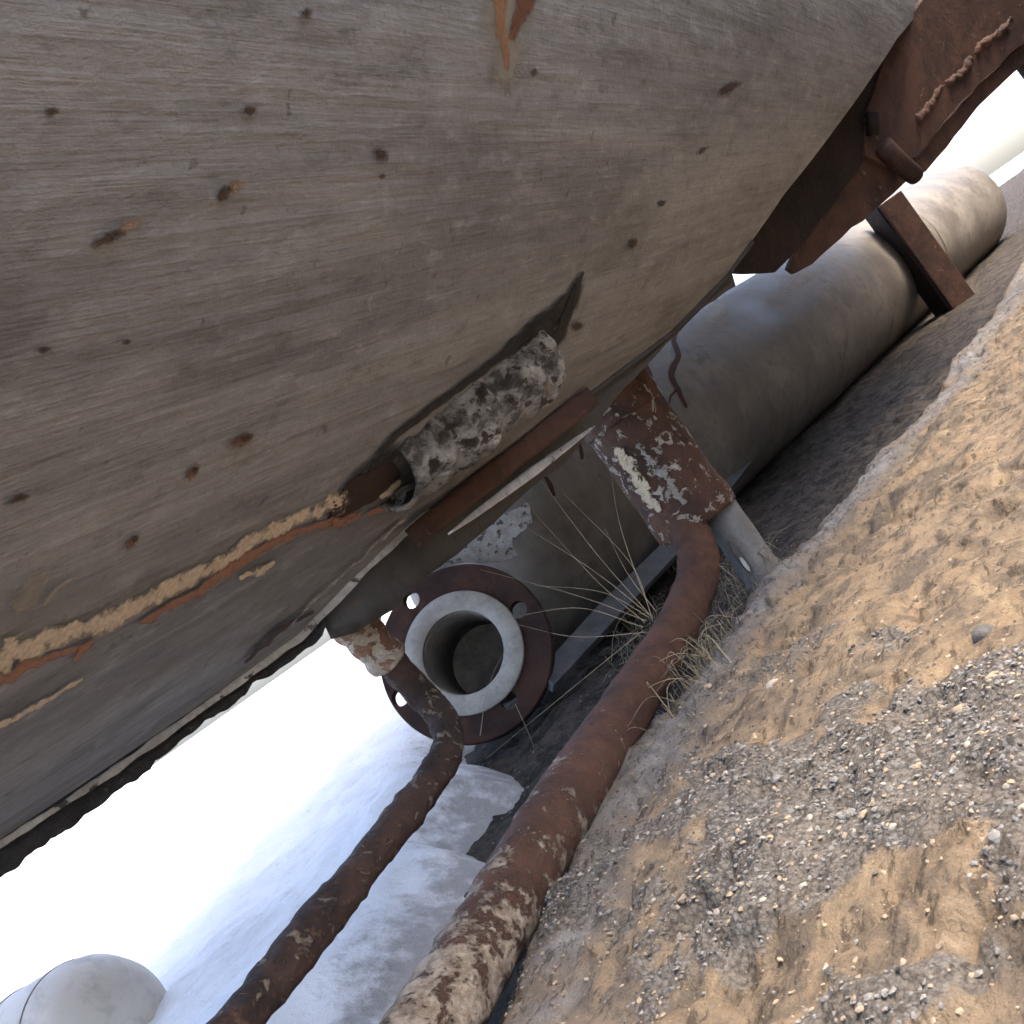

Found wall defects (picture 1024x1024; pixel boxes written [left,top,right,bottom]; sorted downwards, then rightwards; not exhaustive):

corrosion [490,0,535,81]
corrosion [217,181,240,201]
corrosion [93,222,135,248]
corrosion [231,434,252,447]
corrosion [7,494,29,504]
peeling [614,443,692,516]
peeling [0,479,406,686]
peeling [0,678,83,728]